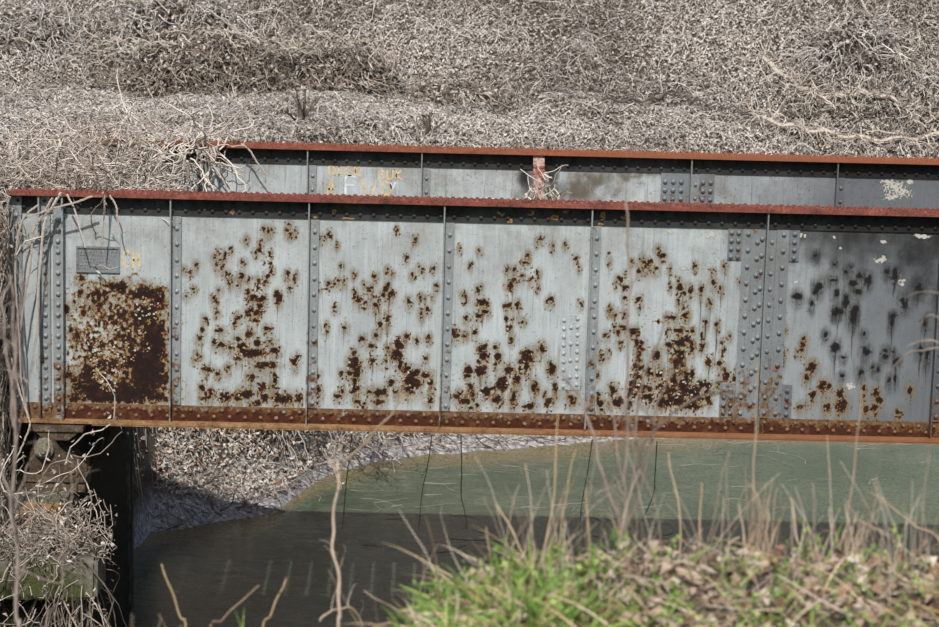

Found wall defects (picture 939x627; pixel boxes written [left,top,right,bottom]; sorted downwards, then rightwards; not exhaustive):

rust [52,221,939,437]